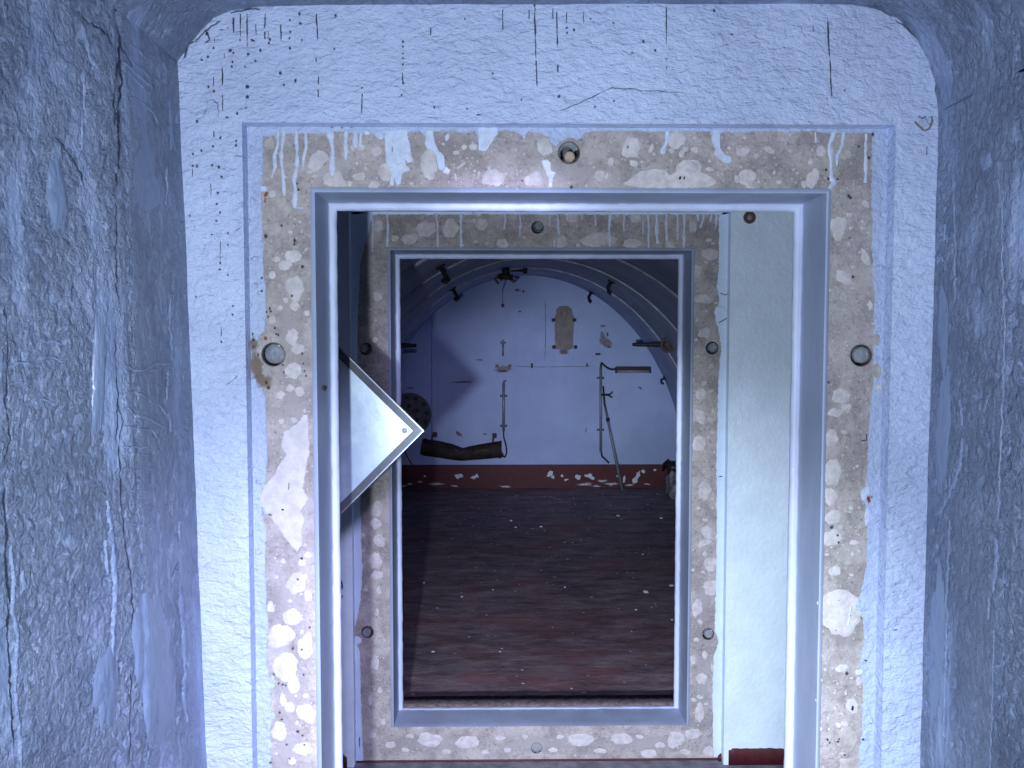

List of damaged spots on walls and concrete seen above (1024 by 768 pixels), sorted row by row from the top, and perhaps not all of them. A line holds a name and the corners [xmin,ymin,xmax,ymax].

crack [563,87,677,110]
crack [82,15,132,293]
water stain [279,131,308,209]
water stain [343,131,364,160]
water stain [825,131,845,180]
water stain [858,133,874,183]
water stain [647,213,718,248]
crack [114,341,134,623]
crack [126,673,134,757]